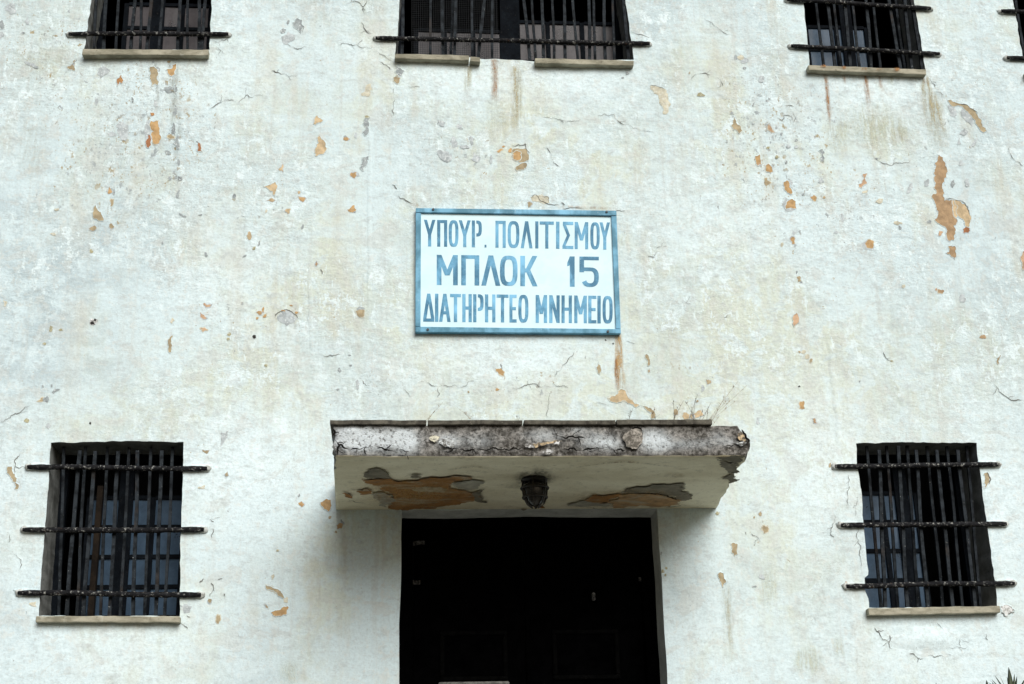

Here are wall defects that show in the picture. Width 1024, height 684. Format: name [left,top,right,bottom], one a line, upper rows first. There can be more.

peeling [144,61,182,198]
peeling [947,99,987,148]
peeling [511,143,530,172]
peeling [727,105,826,211]
peeling [906,154,972,260]
crack [513,353,625,454]
crack [333,425,409,457]
crack [444,447,521,455]
spalling [716,430,750,483]
peeling [319,468,487,533]
peeling [568,484,693,510]
peeling [264,574,290,617]